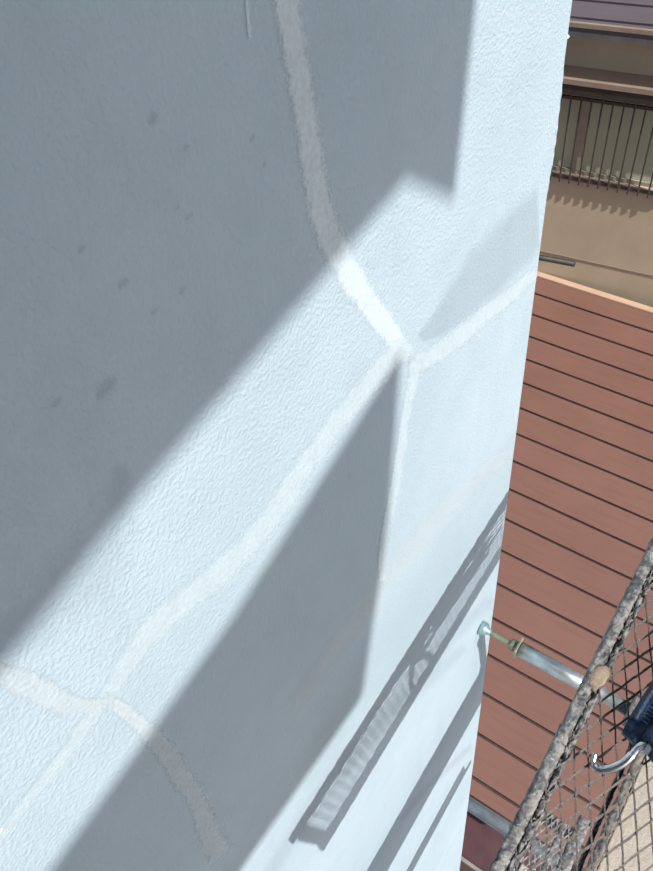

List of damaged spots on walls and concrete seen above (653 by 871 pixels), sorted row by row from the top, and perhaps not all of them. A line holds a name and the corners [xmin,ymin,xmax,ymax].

crack [108,696,233,865]
crack [0,0,536,837]